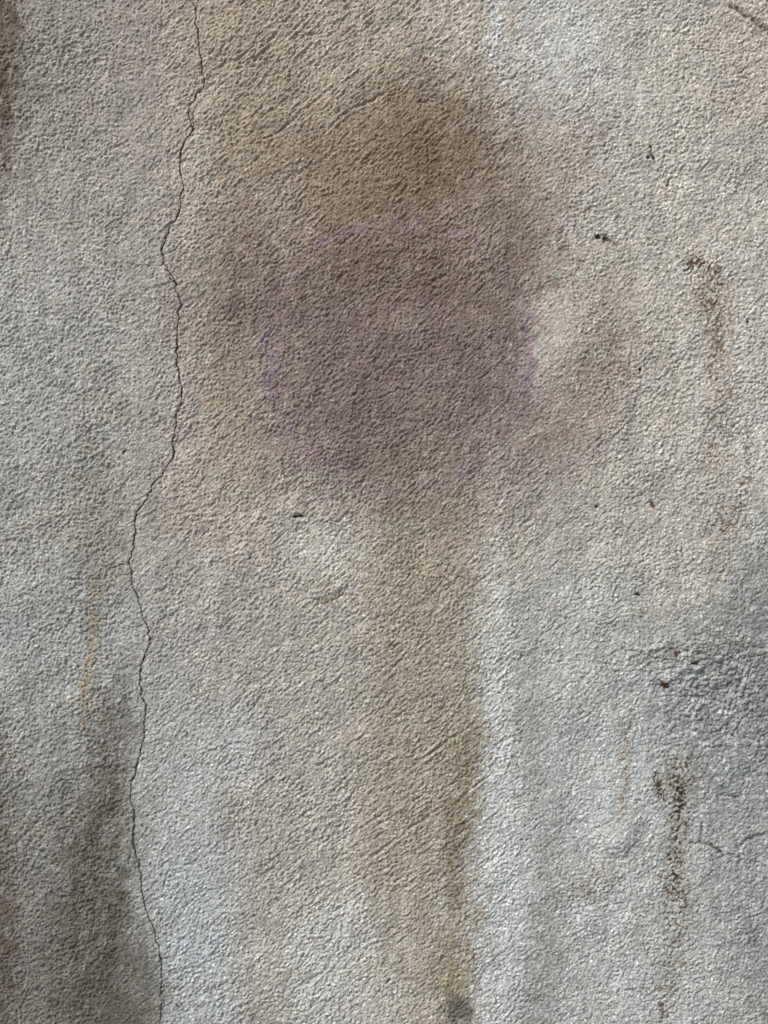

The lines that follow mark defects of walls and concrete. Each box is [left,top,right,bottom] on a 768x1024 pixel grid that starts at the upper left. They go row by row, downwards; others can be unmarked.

crack [109,0,209,1024]
damp [0,350,636,1024]
damp [171,0,614,296]
damp [577,251,768,1024]